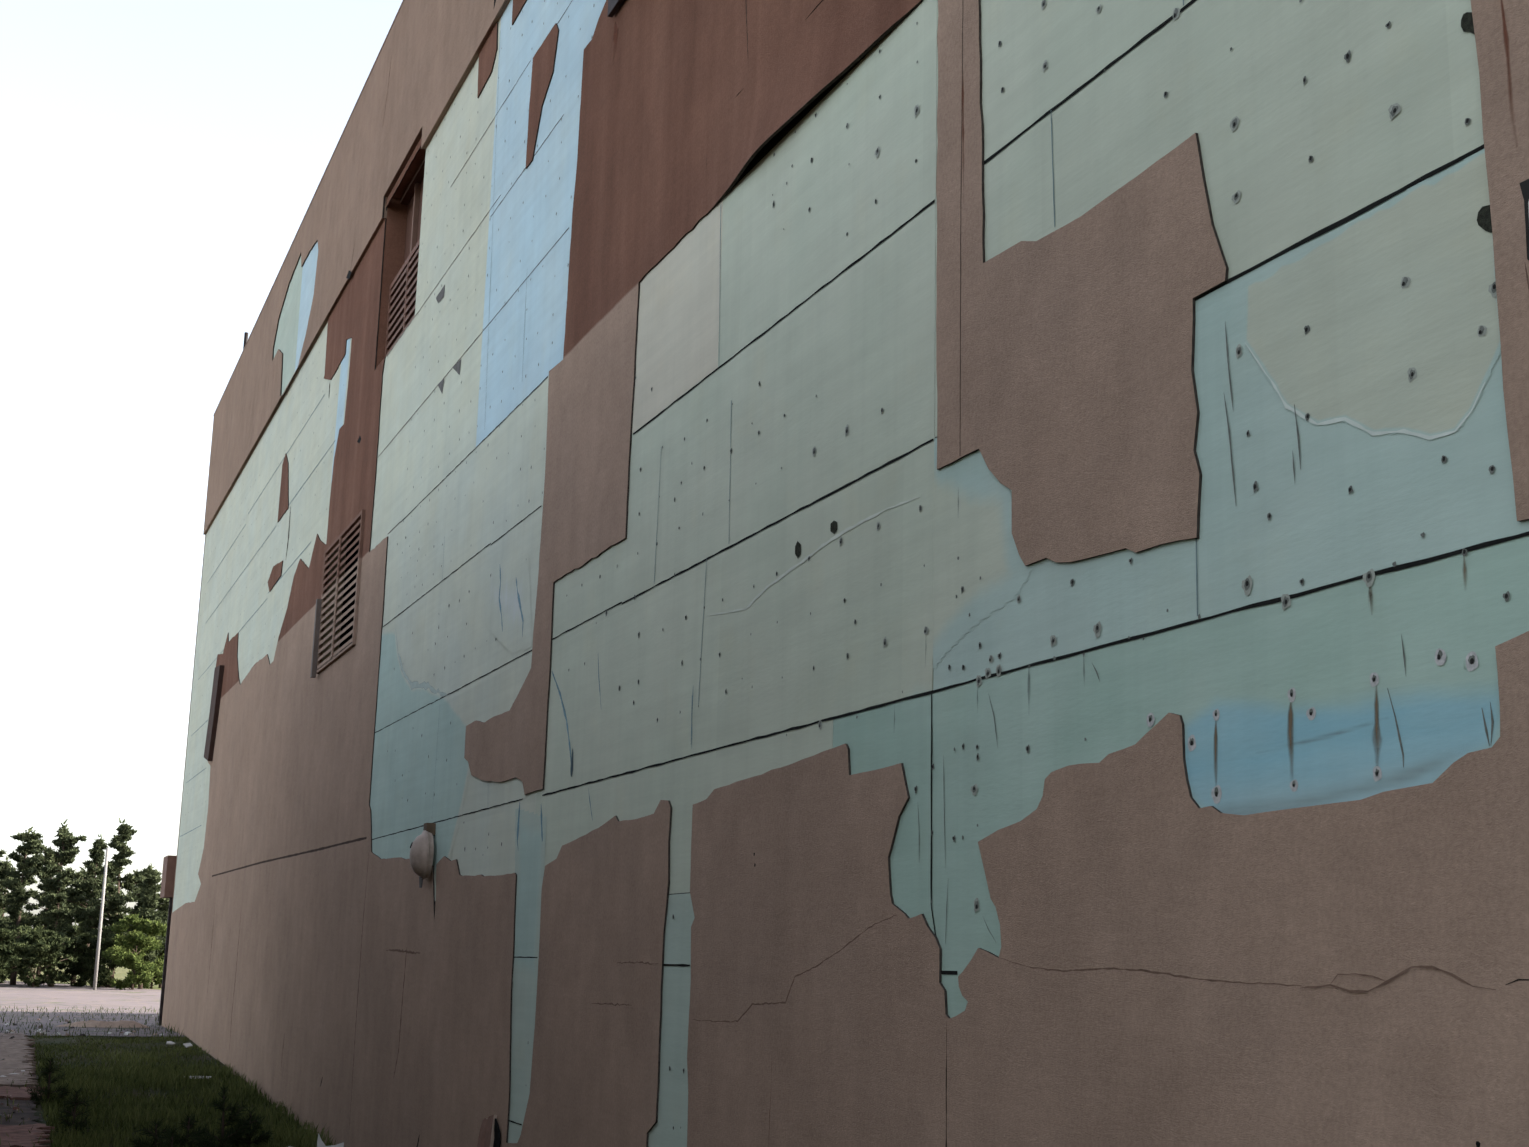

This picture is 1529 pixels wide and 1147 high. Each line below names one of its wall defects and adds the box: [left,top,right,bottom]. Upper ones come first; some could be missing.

peeling [172,242,352,913]
peeling [357,0,1529,1147]
crack [693,915,895,1022]
crack [1001,958,1529,993]